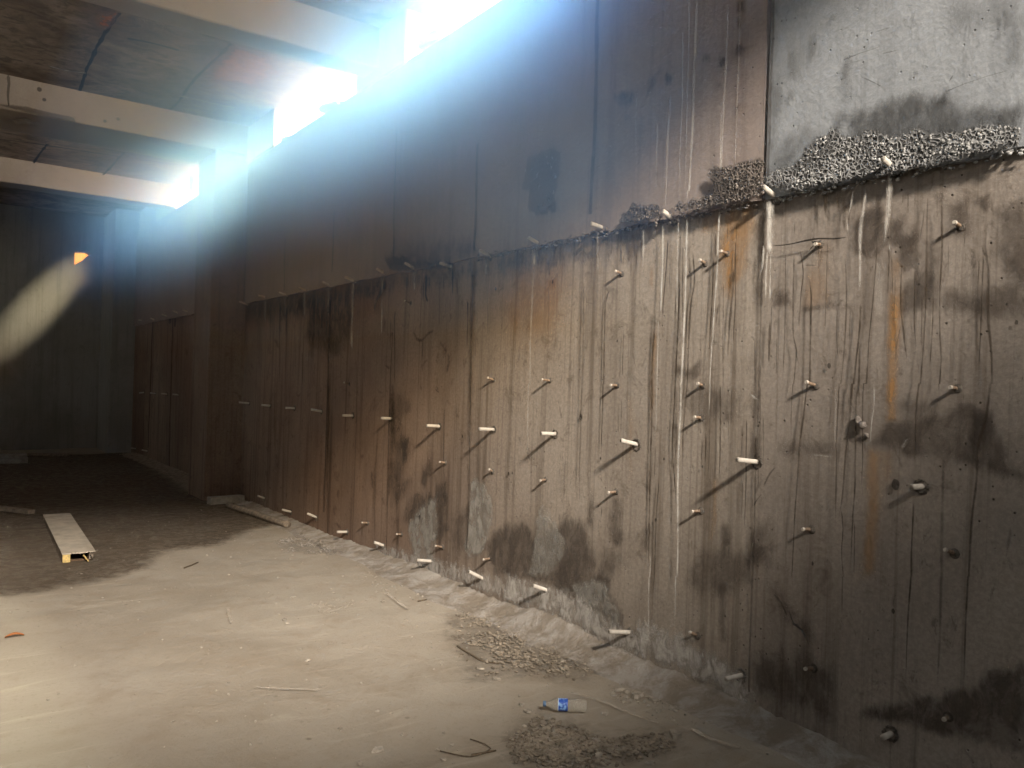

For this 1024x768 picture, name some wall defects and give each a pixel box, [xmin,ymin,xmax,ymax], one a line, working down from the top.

leakage [762,202,812,569]
leakage [490,518,621,626]
leakage [868,668,1024,744]